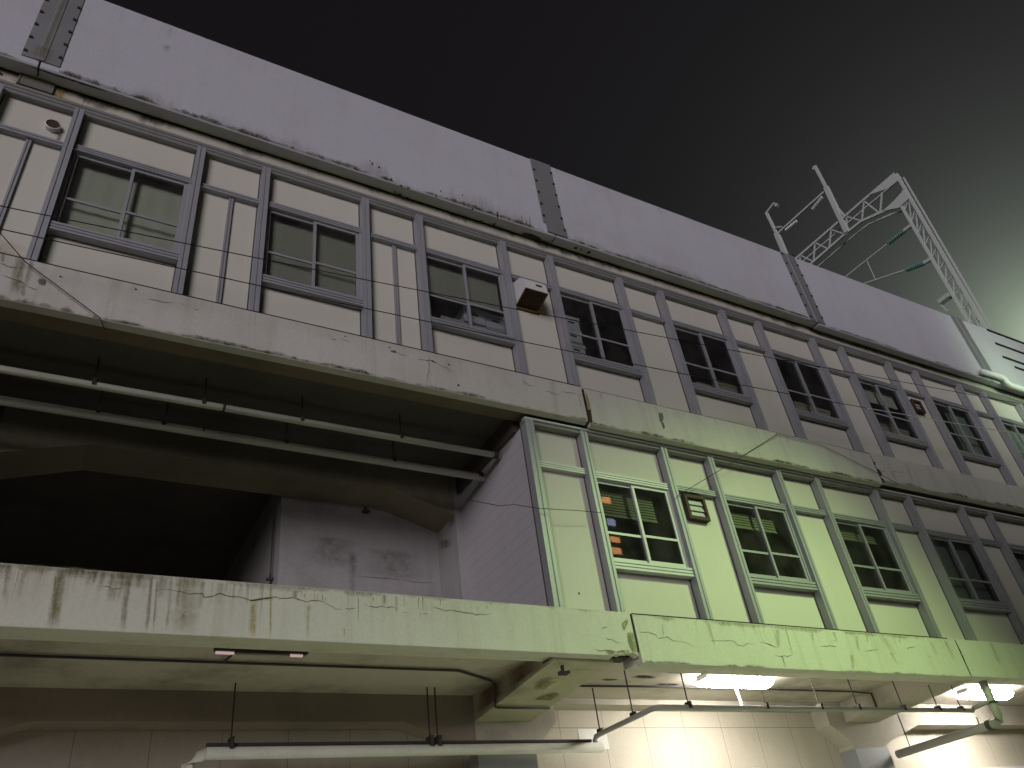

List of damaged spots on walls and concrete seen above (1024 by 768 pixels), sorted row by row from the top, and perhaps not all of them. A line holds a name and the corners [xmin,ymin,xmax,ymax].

crack [162,589,490,615]